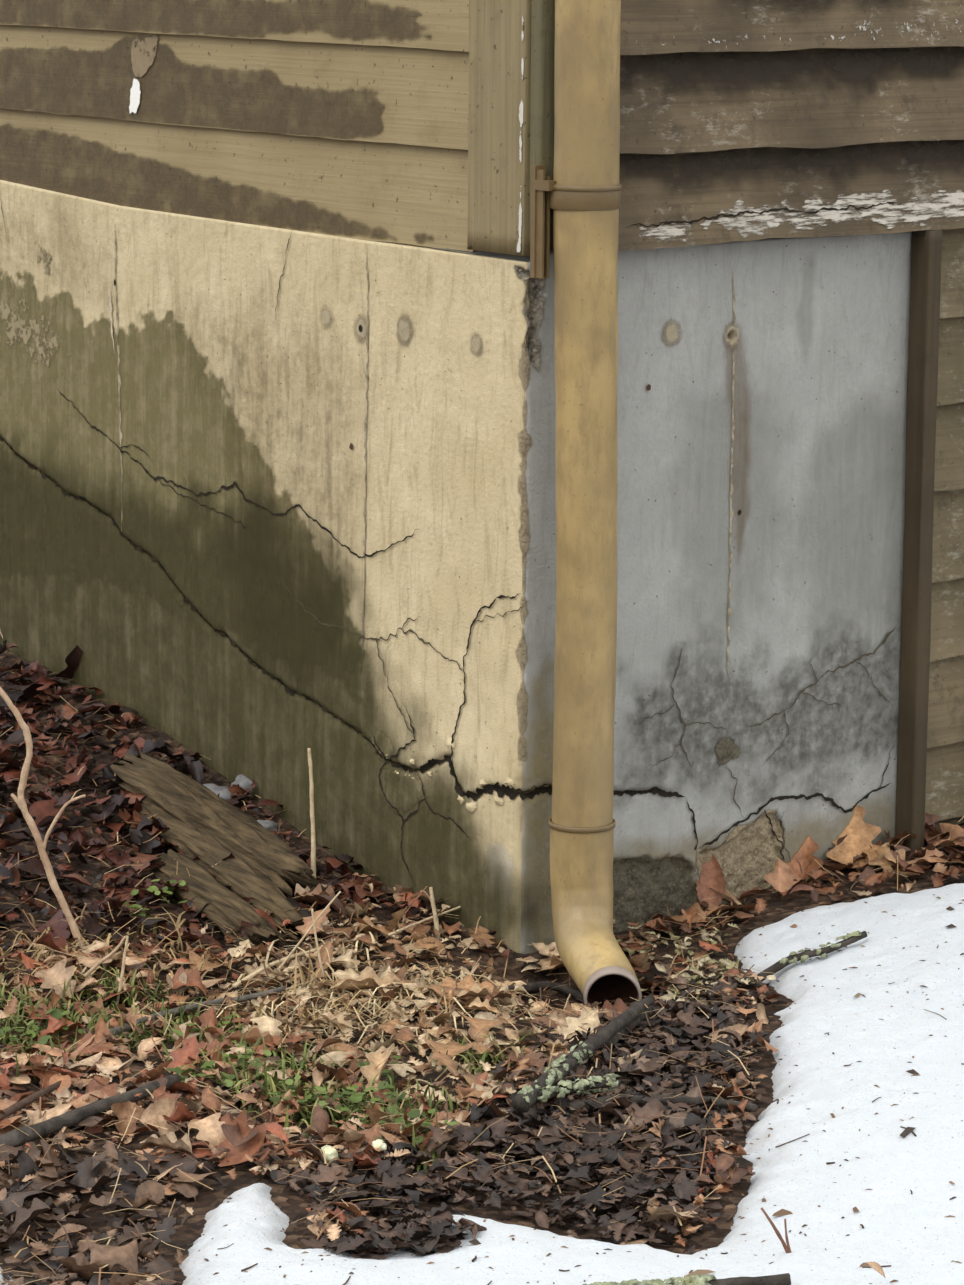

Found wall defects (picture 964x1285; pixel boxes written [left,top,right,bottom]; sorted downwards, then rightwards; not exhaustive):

peeling [129,33,158,113]
damp [0,0,431,139]
damp [0,125,388,239]
peeling [639,190,964,242]
crack [57,388,416,558]
spalling [514,186,546,760]
crack [0,436,552,887]
crack [613,623,898,863]
damp [634,639,899,779]
spalling [613,810,785,933]